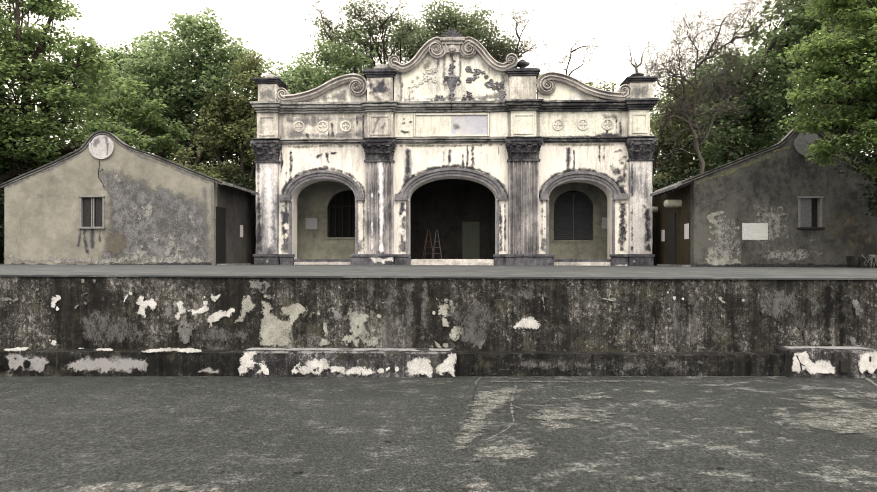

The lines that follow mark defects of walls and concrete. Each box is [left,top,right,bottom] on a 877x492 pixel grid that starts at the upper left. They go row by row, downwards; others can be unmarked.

leakage [77,149,213,265]
leakage [280,115,385,253]
leakage [523,115,634,252]
leakage [643,205,651,251]
peeling [705,211,741,266]
leakage [80,311,143,347]
peeling [124,280,381,375]
leakage [299,280,446,354]
peeling [291,298,464,378]
peeling [506,316,541,342]
peeling [792,351,877,375]
peeling [852,294,864,317]